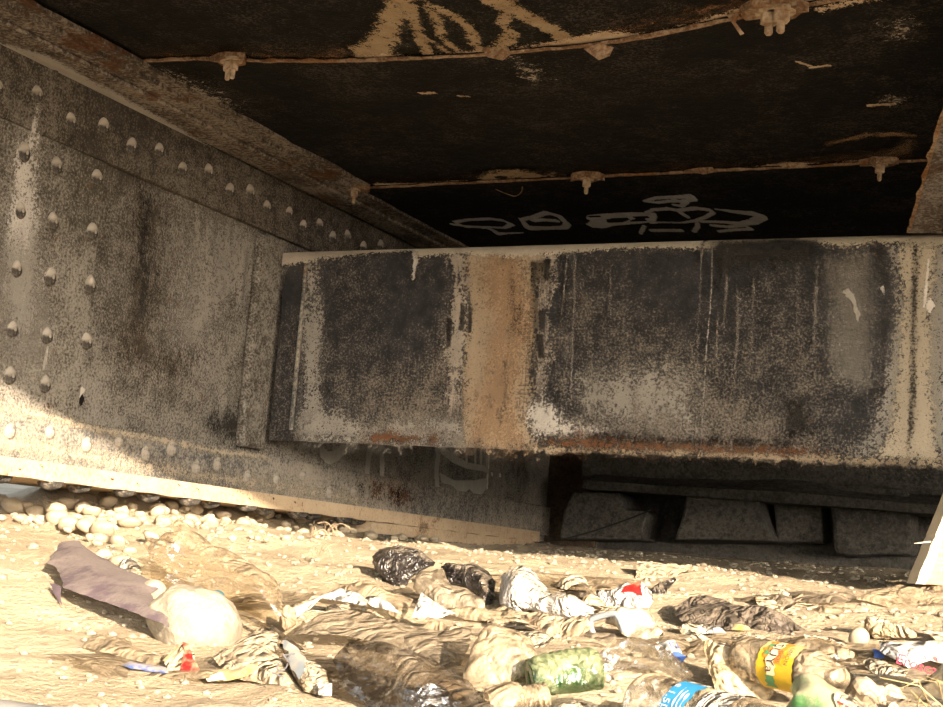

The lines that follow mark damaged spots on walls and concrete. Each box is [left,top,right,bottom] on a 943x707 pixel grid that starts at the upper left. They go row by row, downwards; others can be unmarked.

leakage [278,234,943,469]
rust [455,252,943,470]